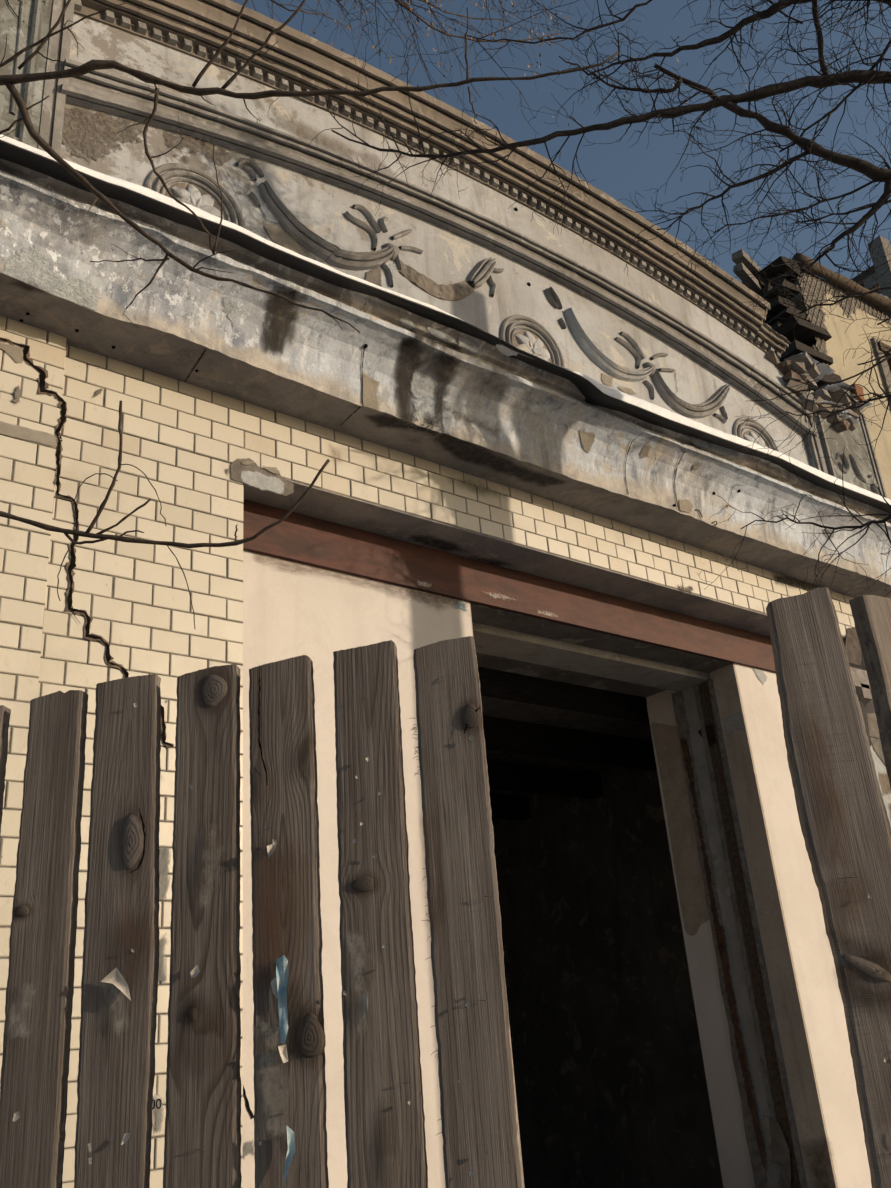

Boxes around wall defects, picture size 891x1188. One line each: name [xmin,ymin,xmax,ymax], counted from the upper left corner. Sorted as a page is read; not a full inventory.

damp [262,287,298,354]
damp [368,330,563,485]
spalling [765,351,872,433]
crack [0,337,129,678]
spalling [226,458,294,496]
crack [161,705,174,749]
corrosion [680,738,767,1170]